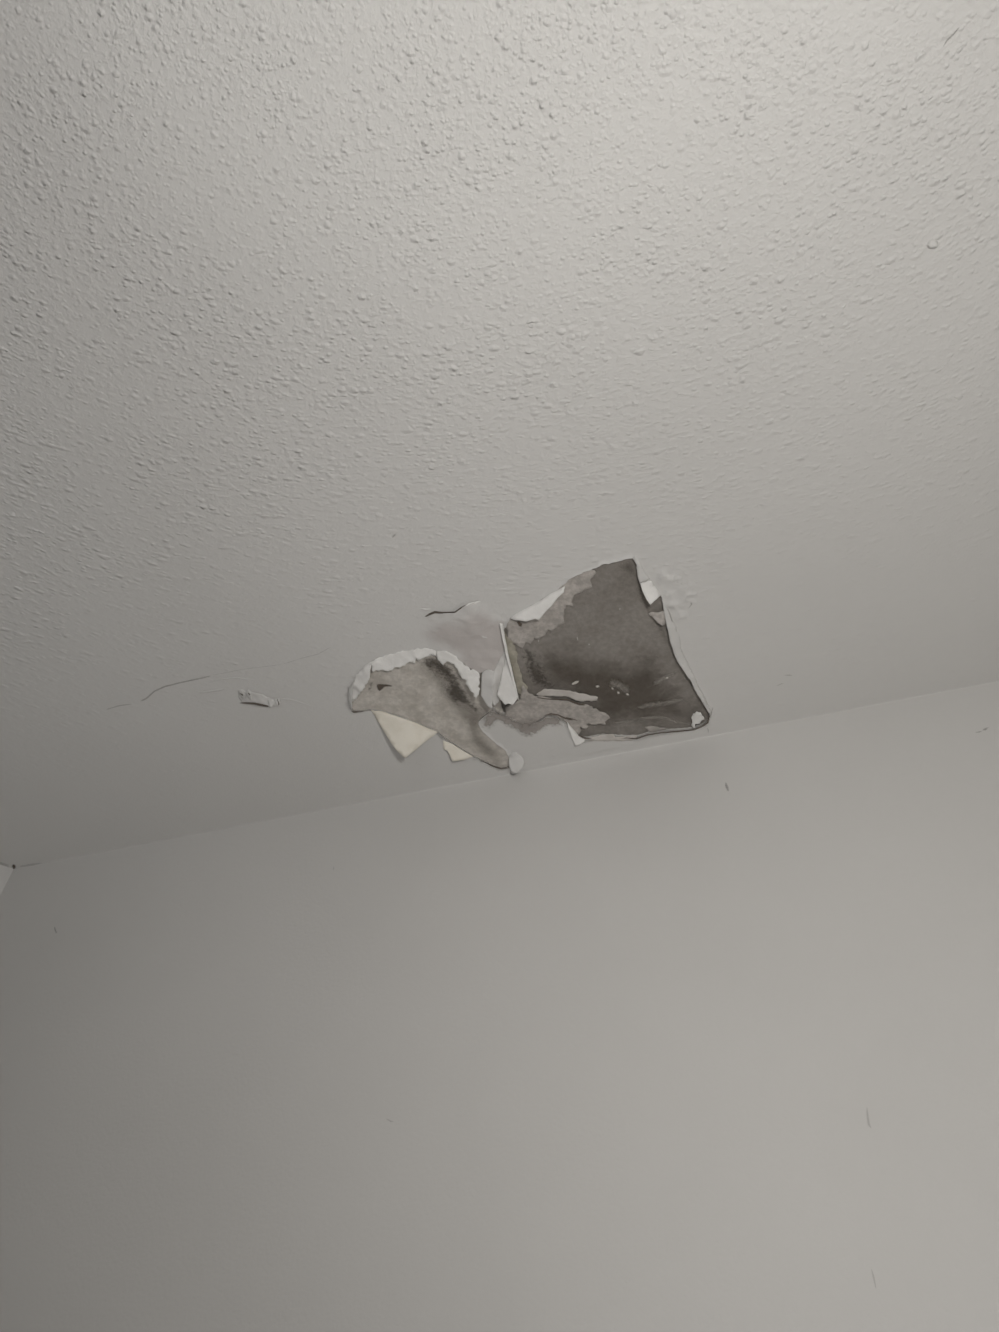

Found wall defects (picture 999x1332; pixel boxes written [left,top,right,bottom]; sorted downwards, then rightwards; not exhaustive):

peeling [348,555,712,774]